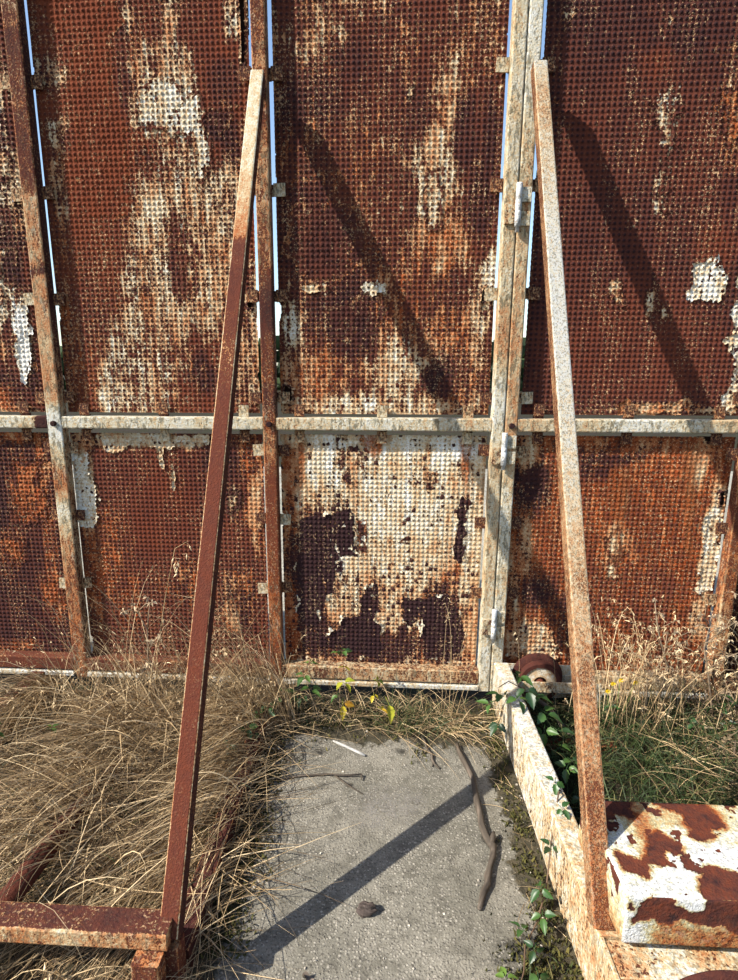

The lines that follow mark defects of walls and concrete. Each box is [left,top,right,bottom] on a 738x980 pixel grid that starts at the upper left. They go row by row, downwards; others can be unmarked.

peeling [133,75,215,184]
corrosion [280,201,366,284]
corrosion [125,285,150,296]
corrosion [326,291,387,352]
peeling [604,276,628,308]
peeling [639,274,670,326]
peeling [686,254,738,303]
corrosion [28,361,38,395]
peeling [617,301,738,416]
corrosion [516,462,552,506]